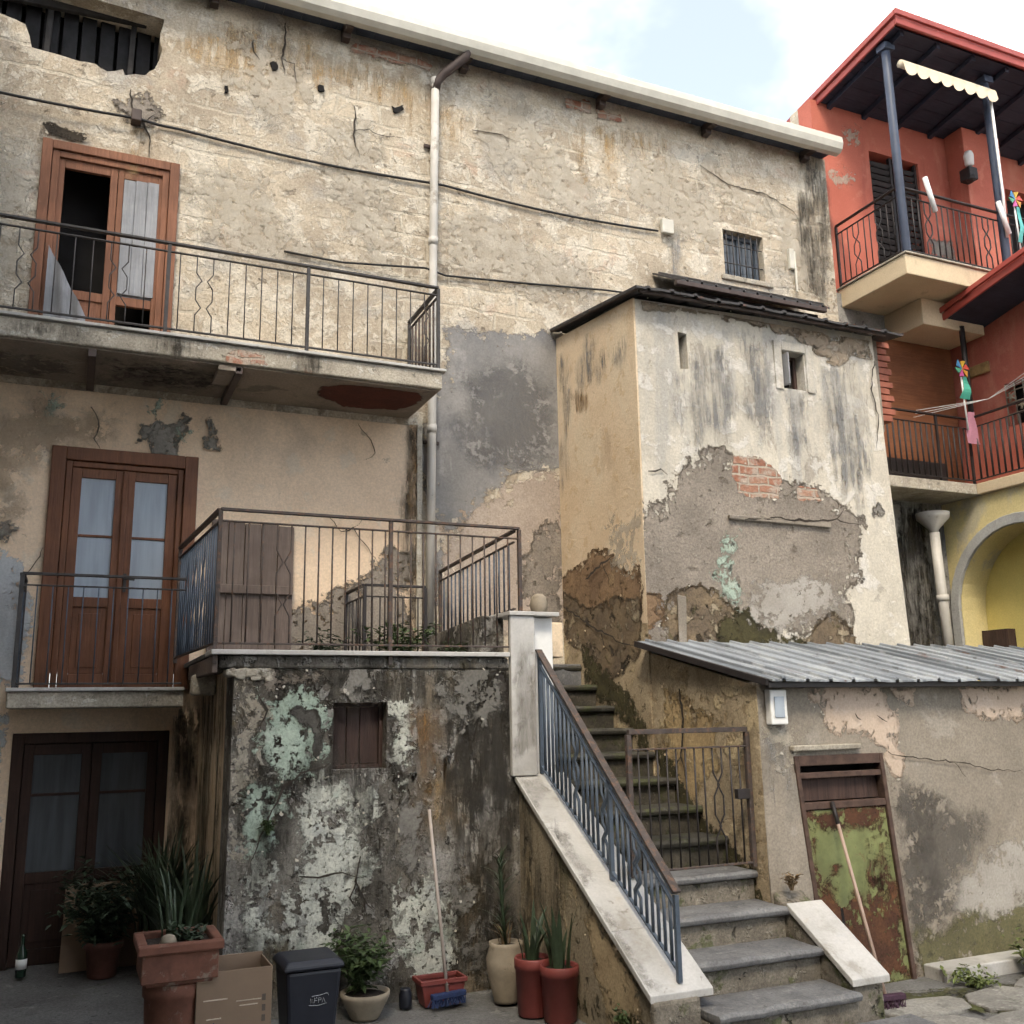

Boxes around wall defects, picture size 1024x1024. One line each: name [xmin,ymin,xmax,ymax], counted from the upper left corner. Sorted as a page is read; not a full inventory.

flaking render [732,455,821,502]